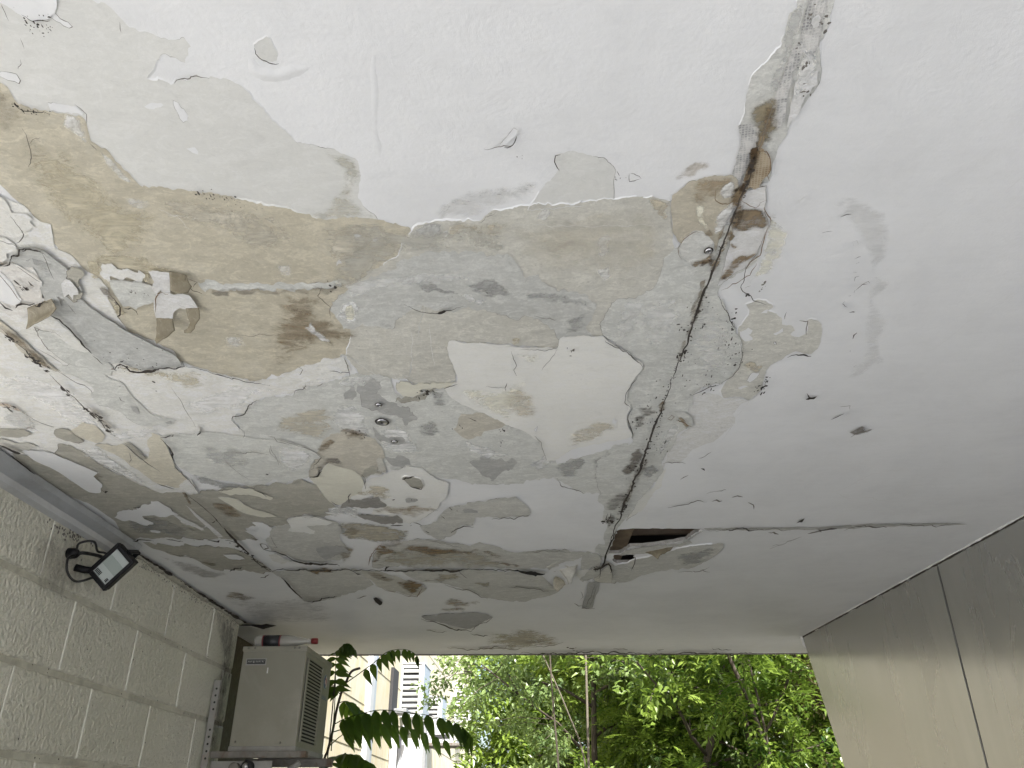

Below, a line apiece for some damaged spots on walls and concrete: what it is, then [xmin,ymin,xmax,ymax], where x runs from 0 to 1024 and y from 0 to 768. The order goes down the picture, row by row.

leakage [671,100,786,290]
peeling [0,0,835,605]
crack [574,105,1024,637]
crack [187,495,545,597]
peeling [422,612,492,637]